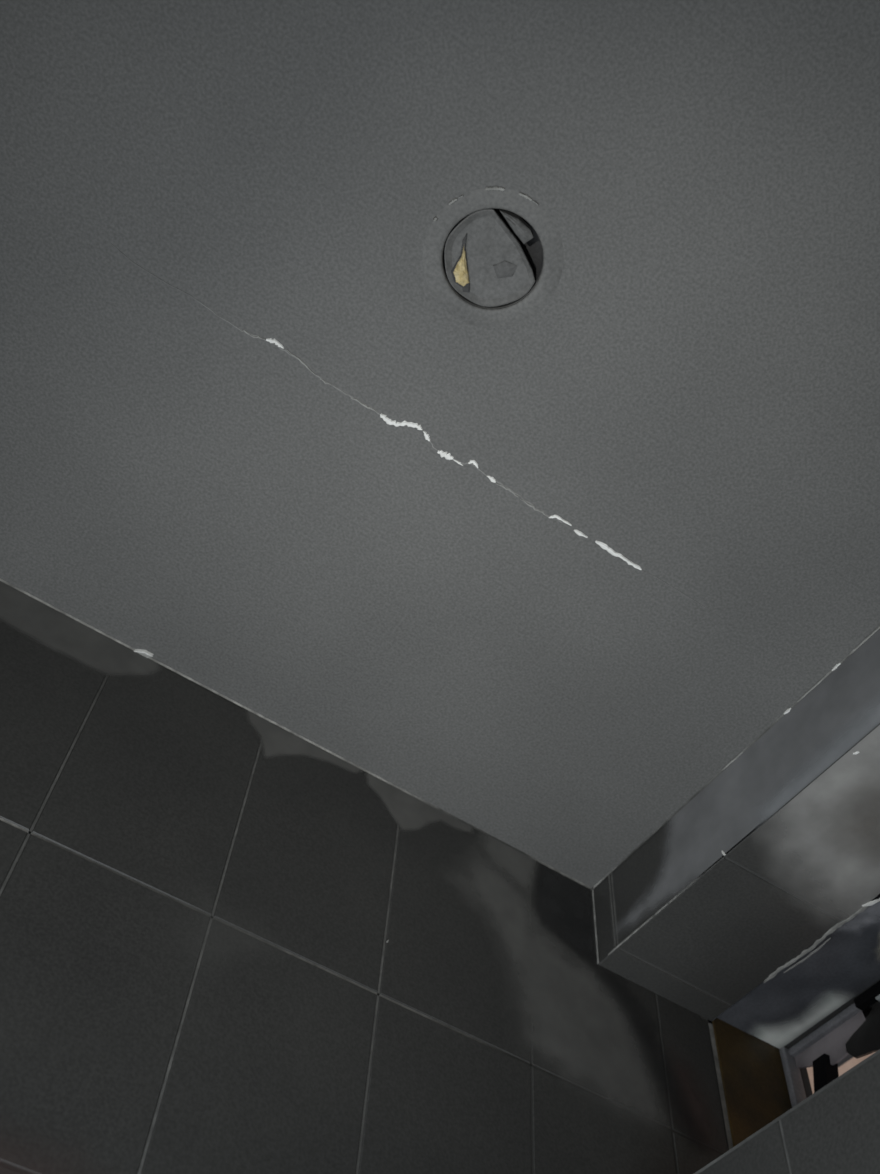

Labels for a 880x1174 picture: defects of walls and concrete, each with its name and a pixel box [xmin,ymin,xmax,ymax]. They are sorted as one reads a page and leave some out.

crack [111,243,721,618]